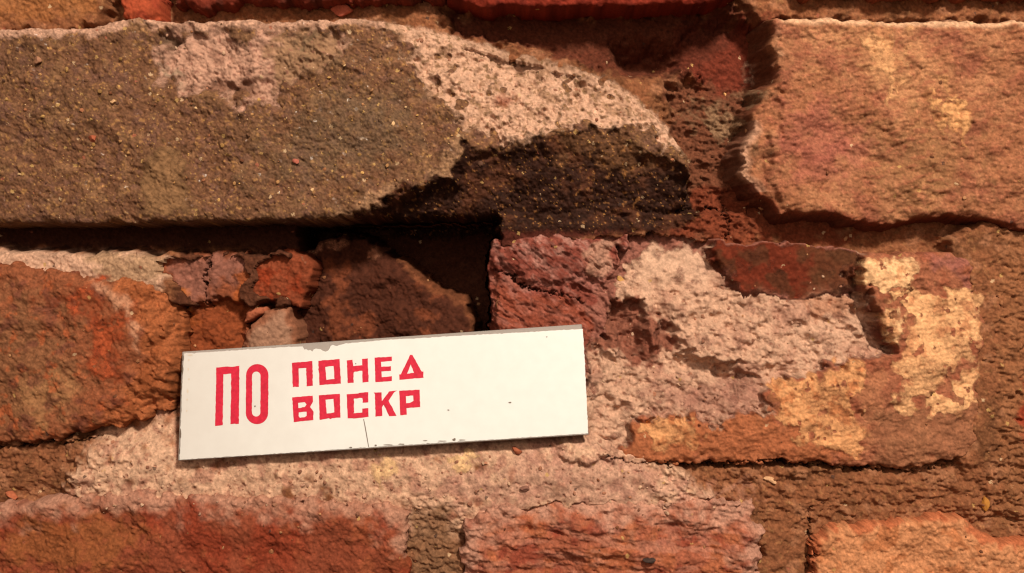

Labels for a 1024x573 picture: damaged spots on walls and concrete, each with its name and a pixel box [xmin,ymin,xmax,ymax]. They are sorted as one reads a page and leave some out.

spalling [585,239,984,460]